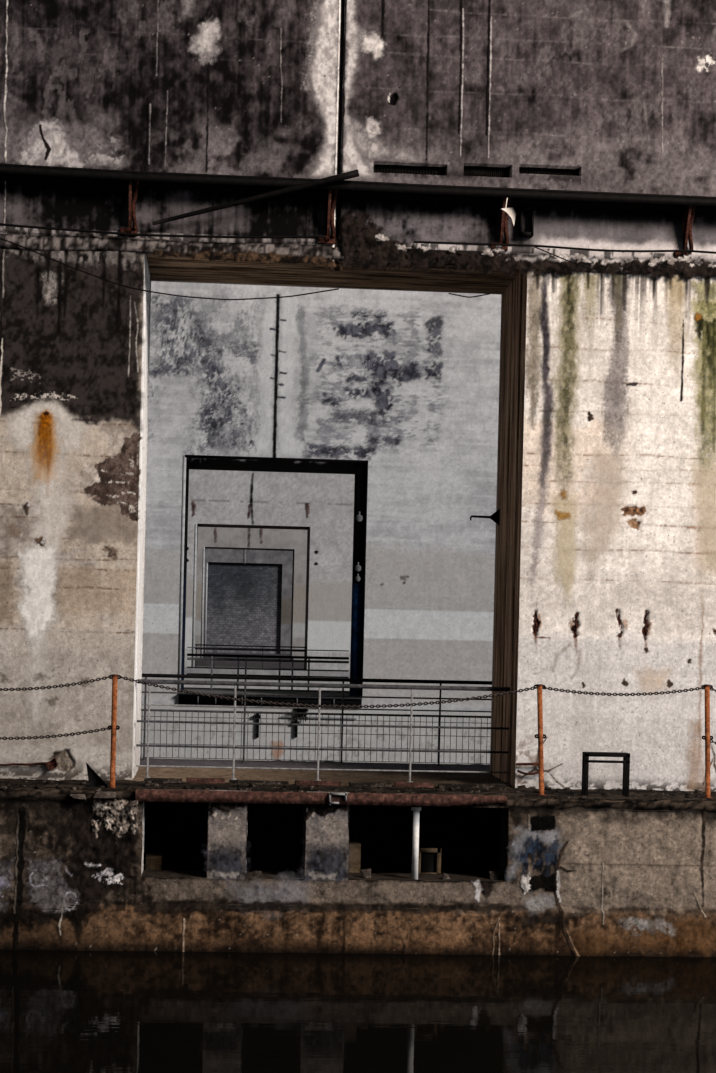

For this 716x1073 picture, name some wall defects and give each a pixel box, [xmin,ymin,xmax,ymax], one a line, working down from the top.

damp [19,121,123,168]
damp [190,19,220,64]
damp [304,0,406,180]
crack [0,0,8,413]
rust [35,411,55,477]
peeling [75,414,110,424]
peeling [68,433,142,559]
damp [0,233,445,722]
damp [526,271,630,589]
spalling [86,798,143,839]
damp [135,844,567,955]
spalling [521,871,560,903]